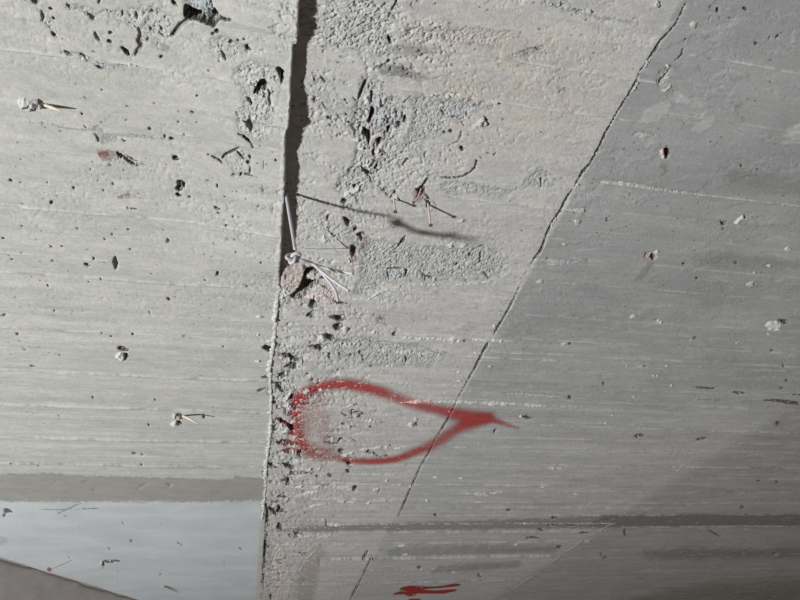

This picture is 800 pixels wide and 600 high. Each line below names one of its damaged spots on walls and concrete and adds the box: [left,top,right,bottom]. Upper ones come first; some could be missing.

crack [397,4,686,516]